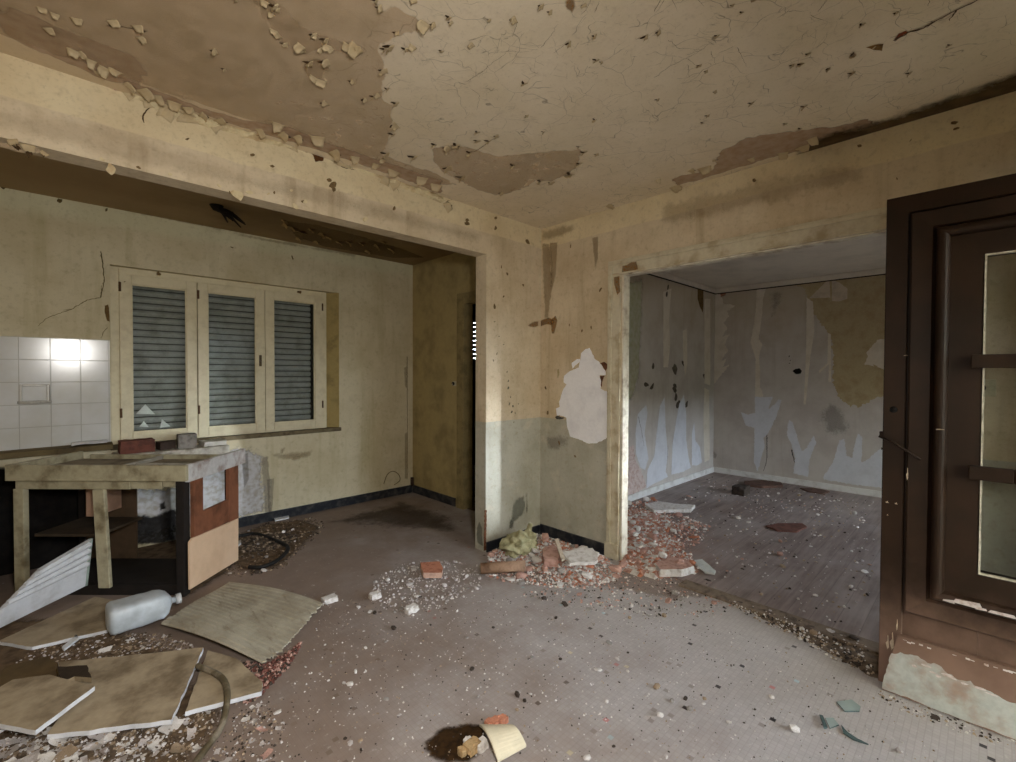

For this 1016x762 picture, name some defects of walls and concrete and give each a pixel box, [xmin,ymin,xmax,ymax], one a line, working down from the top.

crack [873,0,977,98]
peeling [0,0,499,213]
peeling [655,119,874,193]
crack [39,251,105,325]
peeling [672,361,688,408]
flaking render [628,445,646,495]
peeling [879,652,1016,740]